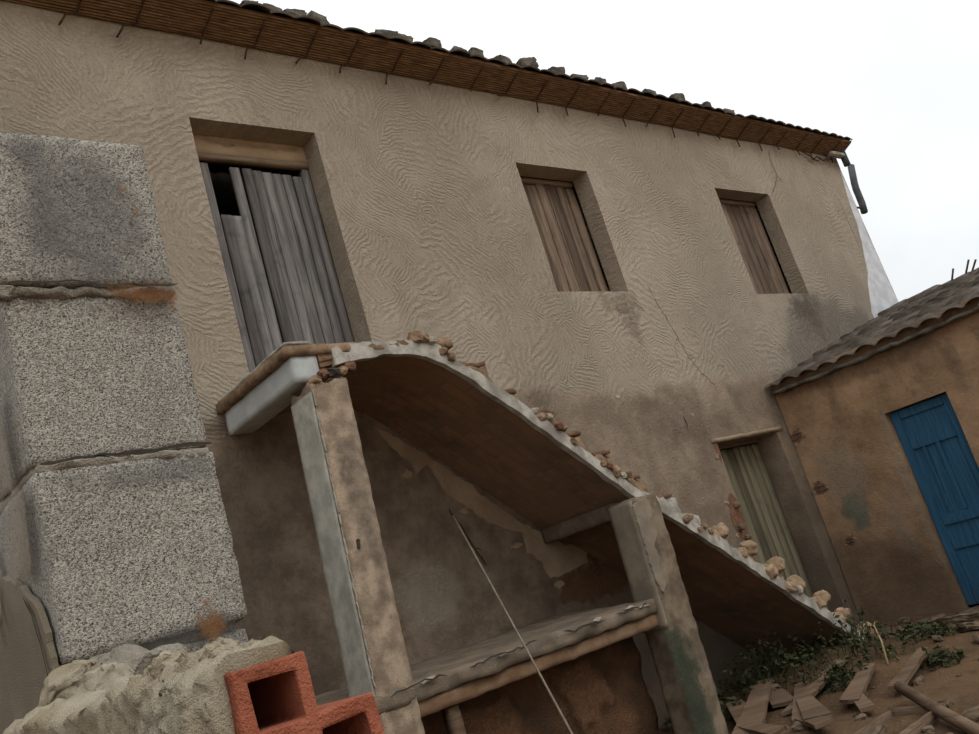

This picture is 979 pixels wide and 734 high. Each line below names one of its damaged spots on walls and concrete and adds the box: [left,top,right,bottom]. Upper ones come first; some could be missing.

spalling [407,331,456,361]
spalling [531,408,579,446]
spalling [600,460,632,479]
flaking render [374,426,587,590]